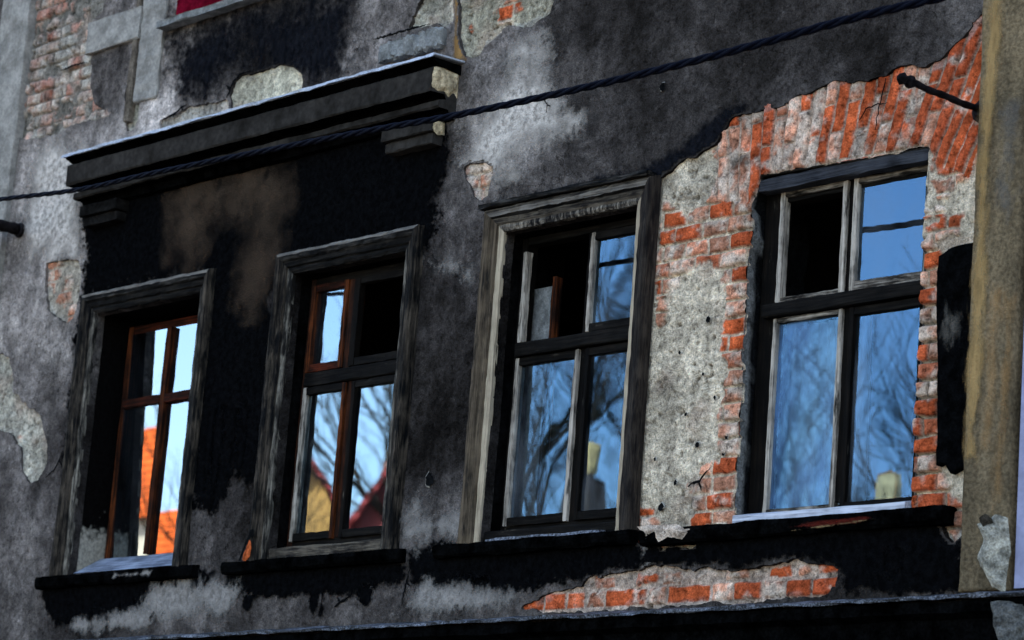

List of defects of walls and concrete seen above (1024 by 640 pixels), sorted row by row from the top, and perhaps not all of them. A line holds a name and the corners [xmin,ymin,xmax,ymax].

spalling [413,0,554,58]
spalling [23,0,111,140]
spalling [162,65,303,128]
water stain [459,29,586,183]
spalling [466,163,493,200]
spalling [48,260,81,323]
spalling [638,15,982,551]
spalling [0,354,47,483]
crack [687,467,711,490]
spalling [524,559,838,613]